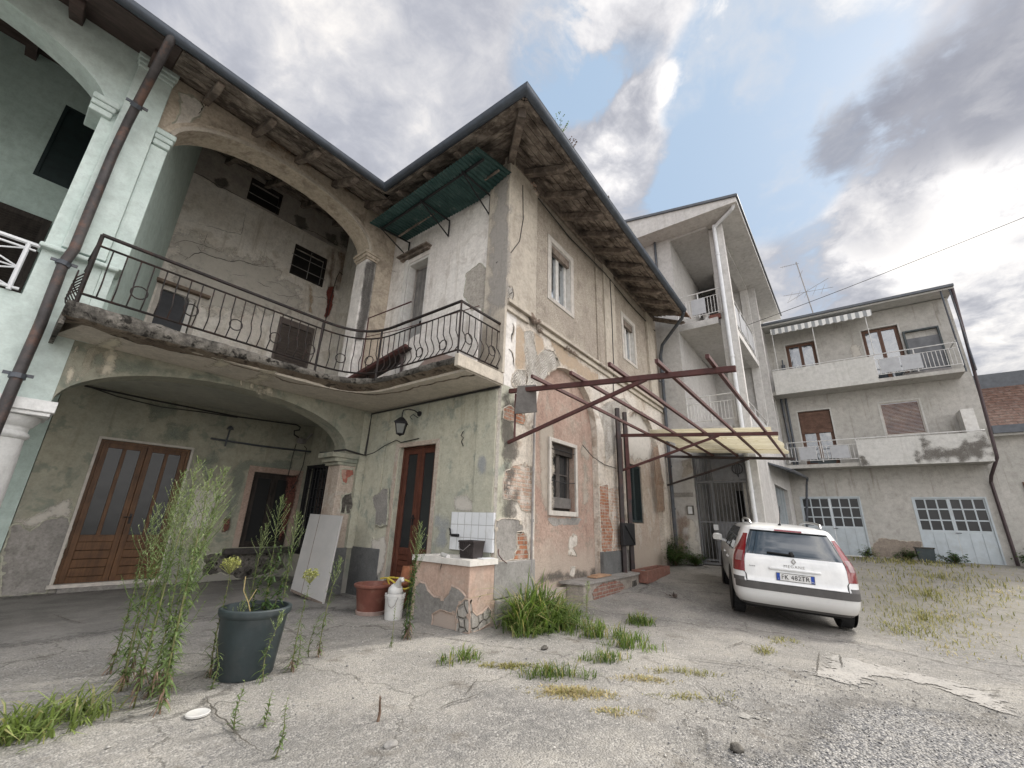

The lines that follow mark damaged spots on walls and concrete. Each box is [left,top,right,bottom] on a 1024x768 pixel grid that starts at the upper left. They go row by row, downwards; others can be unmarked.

crack [175,172,334,303]
spalling [62,314,476,395]
flaking render [511,330,560,388]
water stain [0,499,72,597]
flaking render [340,467,354,514]
flaking render [372,487,389,575]
flaking render [493,462,532,513]
flaking render [512,531,529,561]
flaking render [568,534,577,577]
flaking render [599,484,621,552]
flaking render [412,581,474,625]